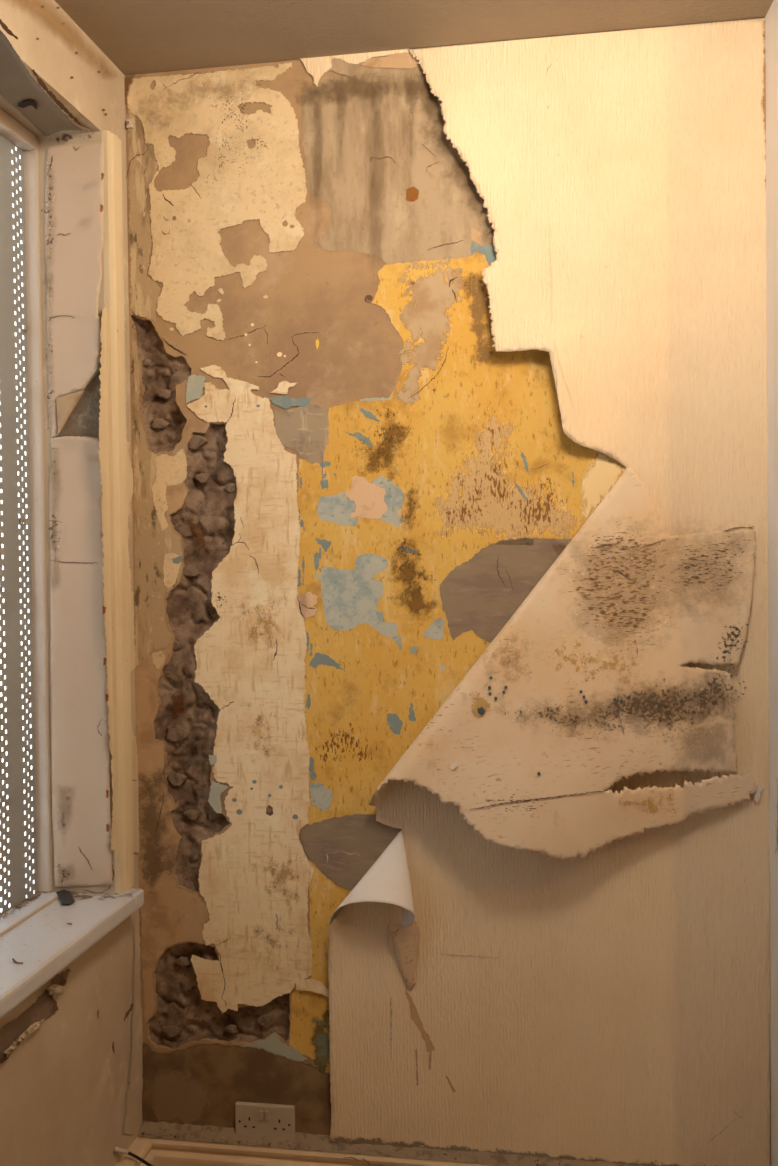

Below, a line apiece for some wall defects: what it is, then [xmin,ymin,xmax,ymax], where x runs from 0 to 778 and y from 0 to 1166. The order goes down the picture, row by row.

damp [407,83,437,115]
peeling [394,258,464,404]
peeling [124,62,307,892]
peeling [344,476,387,520]
peeling [56,307,116,851]
peeling [376,408,758,861]
damp [538,526,750,738]
peeling [314,723,377,770]
peeling [329,831,420,991]
peeling [0,969,71,1064]
spalling [123,914,329,1134]